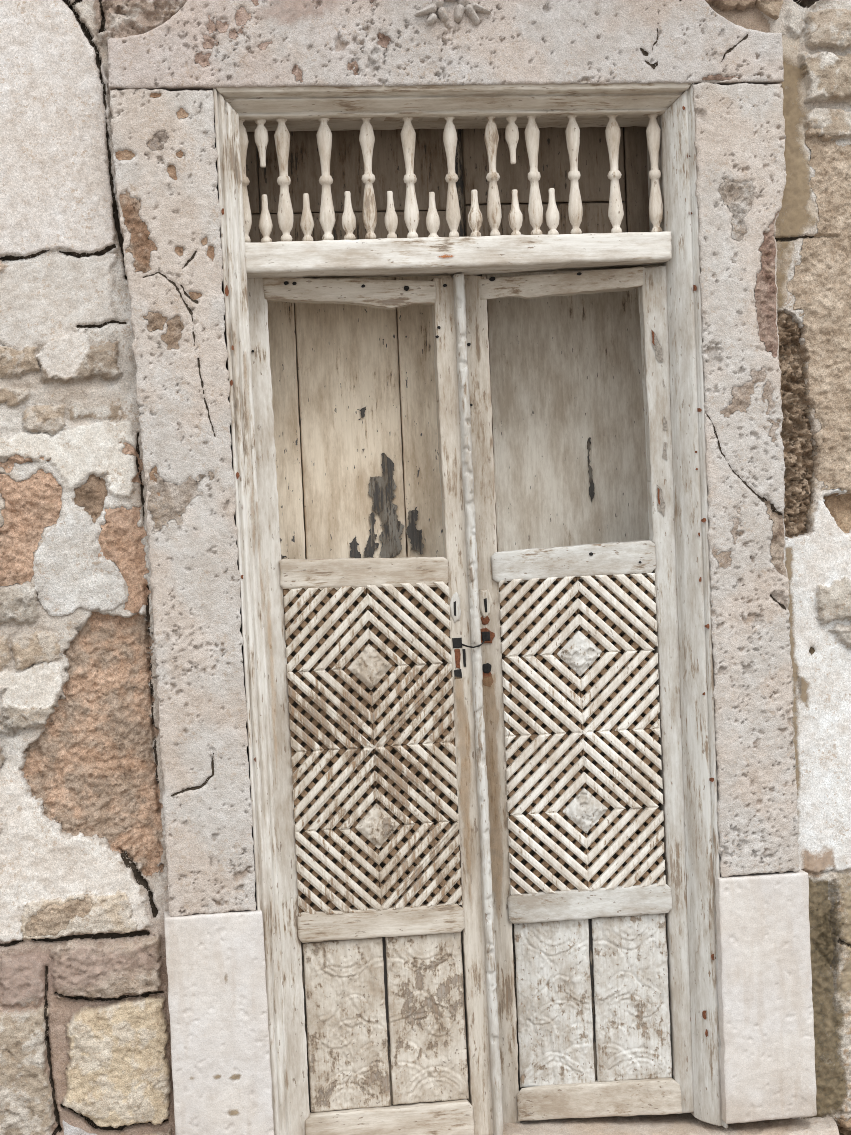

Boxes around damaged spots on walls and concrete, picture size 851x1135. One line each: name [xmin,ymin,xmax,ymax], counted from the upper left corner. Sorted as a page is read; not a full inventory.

crack [793,0,819,8]
crack [0,0,216,437]
spalling [201,237,215,261]
flaking render [718,127,851,577]
crack [136,432,145,524]
crack [706,413,782,515]
spalling [0,442,214,877]
crack [146,585,214,796]